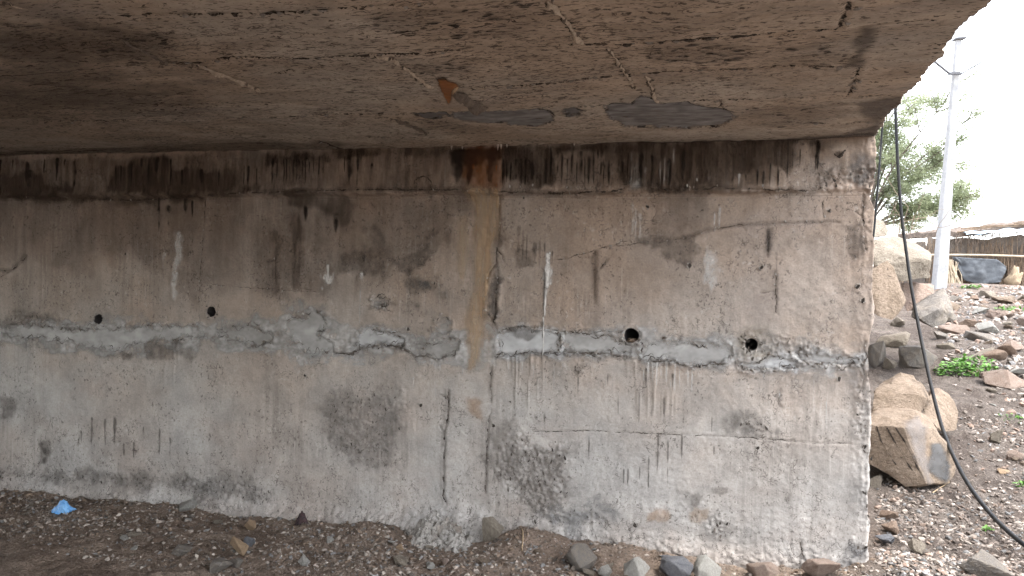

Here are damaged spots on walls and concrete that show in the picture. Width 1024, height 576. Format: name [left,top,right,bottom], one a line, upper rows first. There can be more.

crack [547,1,946,49]
peeling [413,108,586,134]
peeling [604,96,758,129]
water stain [108,148,373,226]
water stain [451,146,466,181]
corrosion [462,147,502,188]
crack [2,184,868,502]